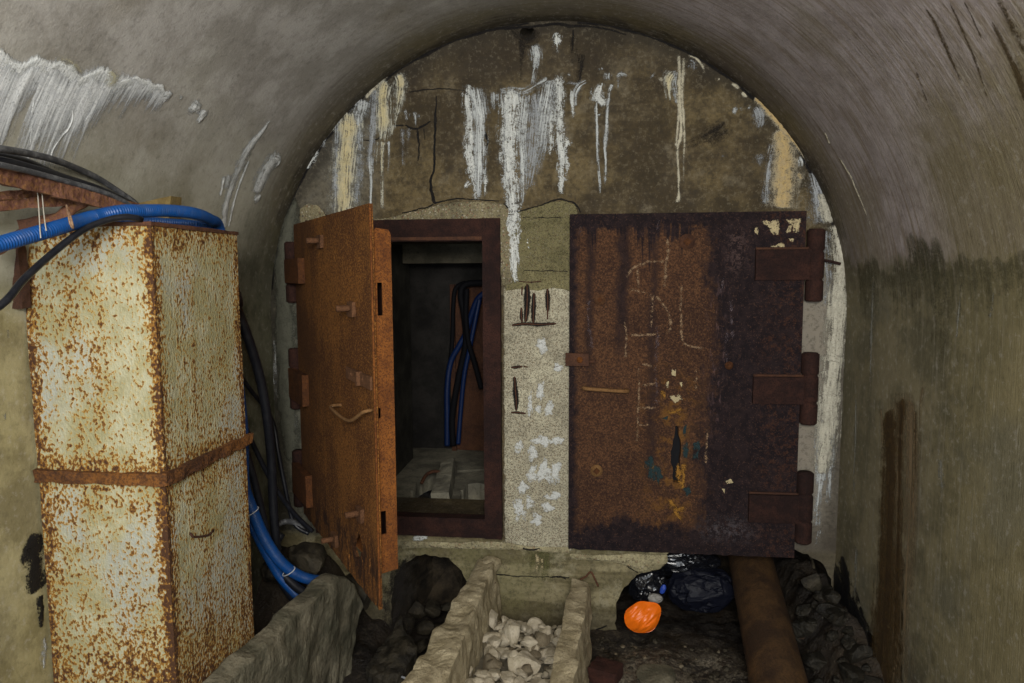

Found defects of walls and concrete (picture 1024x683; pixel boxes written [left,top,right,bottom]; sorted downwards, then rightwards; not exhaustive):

leakage [0,48,208,166]
leakage [219,121,270,227]
leakage [307,74,420,212]
crack [271,22,761,289]
leakage [461,30,626,282]
leakage [652,56,857,538]
corrosion [676,463,686,488]
corrosion [871,388,924,683]